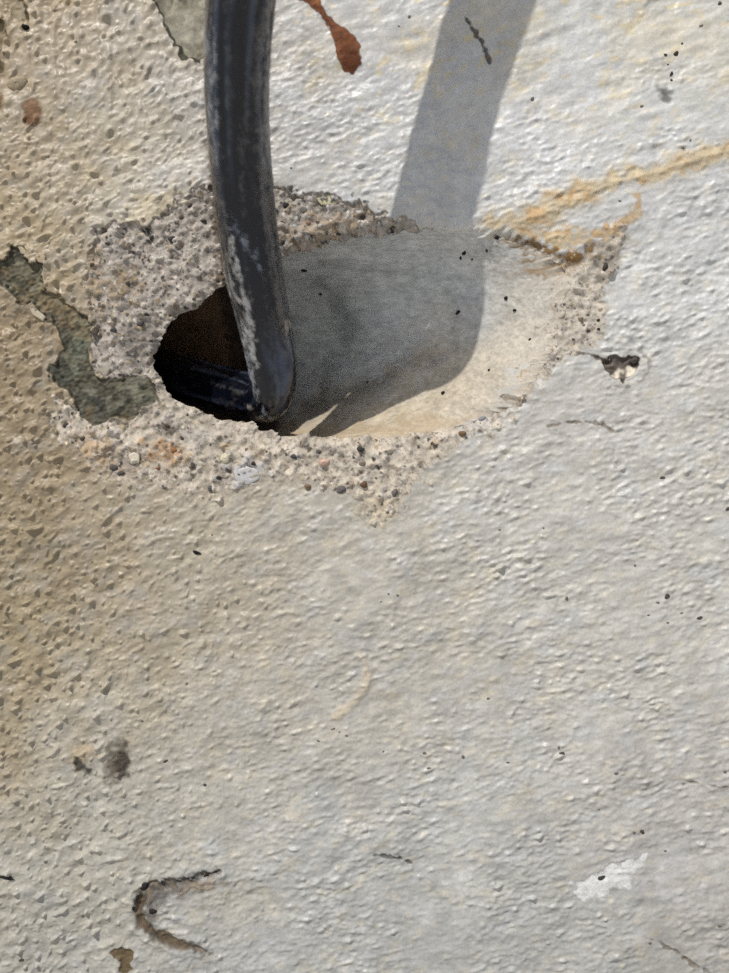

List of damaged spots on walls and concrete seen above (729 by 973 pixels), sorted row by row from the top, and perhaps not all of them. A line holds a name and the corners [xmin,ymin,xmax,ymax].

peeling [153,0,205,63]
corrosion [303,0,361,74]
spalling [0,185,629,529]
peeling [603,355,640,383]
crack [132,870,221,952]